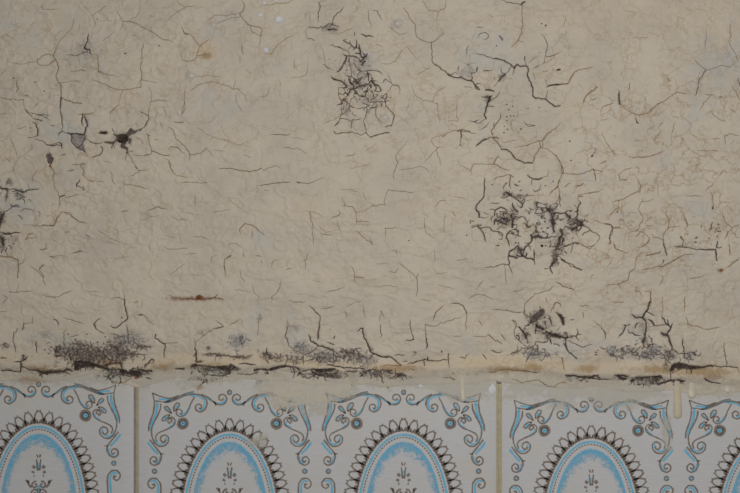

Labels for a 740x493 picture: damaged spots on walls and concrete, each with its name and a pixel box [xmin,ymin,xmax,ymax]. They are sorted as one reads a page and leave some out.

crack [0,5,319,312]
crack [266,0,740,367]
crack [35,291,166,366]
mould [57,338,151,364]
mould [262,342,362,364]